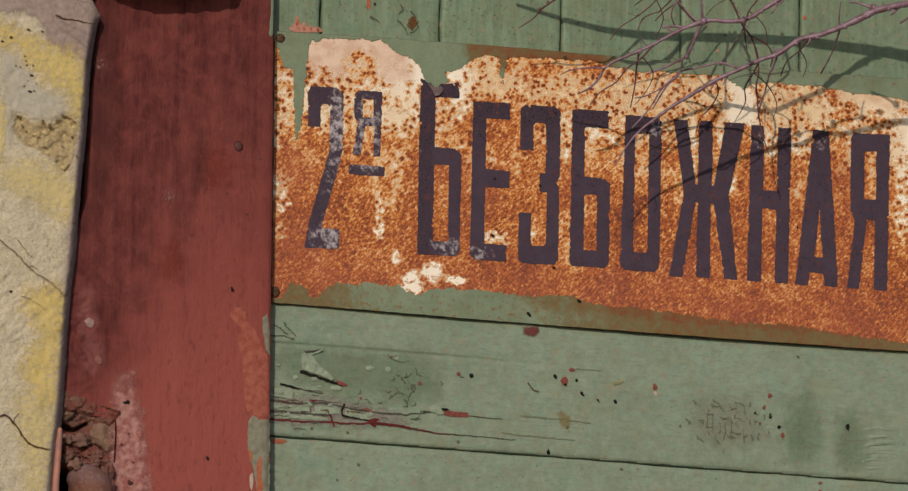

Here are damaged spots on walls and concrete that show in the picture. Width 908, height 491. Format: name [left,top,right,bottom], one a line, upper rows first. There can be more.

corrosion [524,327,539,336]
peeling [229,307,431,491]
crack [0,413,50,450]